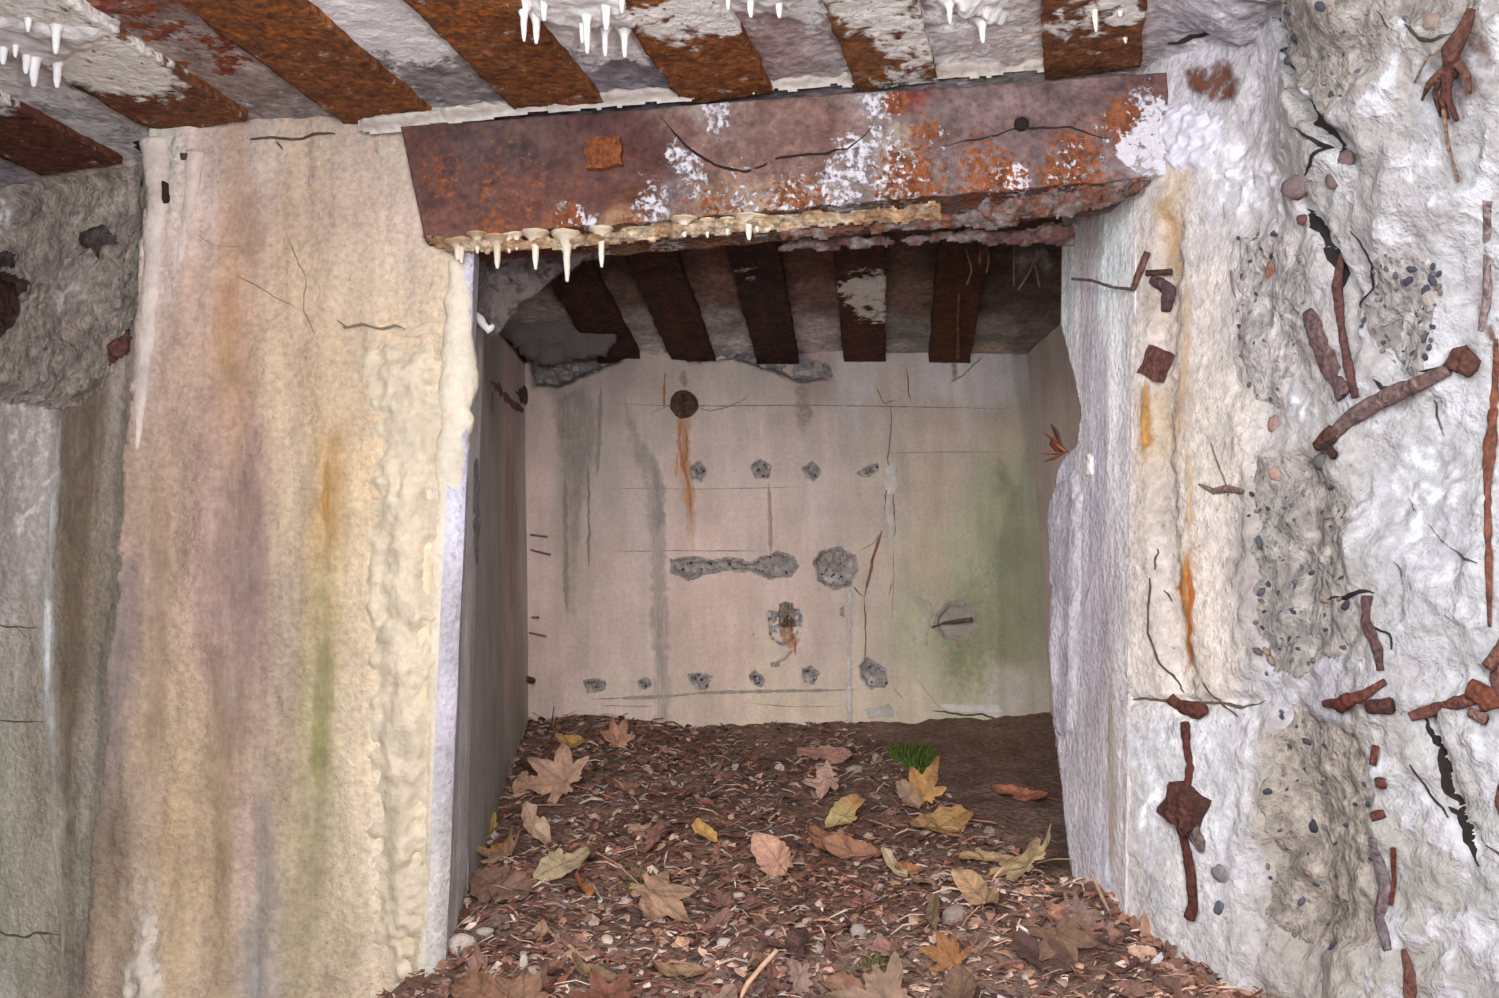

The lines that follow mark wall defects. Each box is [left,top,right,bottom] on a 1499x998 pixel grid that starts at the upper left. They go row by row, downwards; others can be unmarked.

damp [518,0,637,58]
damp [358,87,694,134]
damp [770,72,855,92]
damp [936,59,1044,79]
rust [660,116,871,173]
rust [1302,200,1499,726]
spalling [670,546,859,617]
crack [0,625,43,638]
spalling [749,609,803,687]
rust [1156,694,1212,921]
crack [1409,718,1499,867]
crack [0,930,61,945]